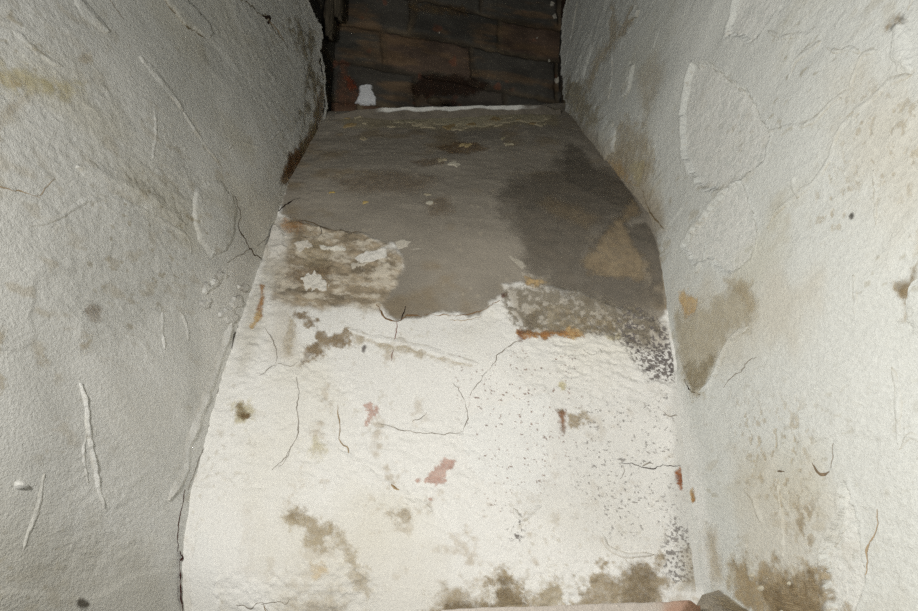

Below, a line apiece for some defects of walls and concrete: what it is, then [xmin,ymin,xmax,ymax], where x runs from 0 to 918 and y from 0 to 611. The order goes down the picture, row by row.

crack [0,180,53,197]
peeling [300,270,329,291]
peeling [293,240,346,253]
peeling [346,246,387,269]
peeling [376,255,659,344]
leakage [503,145,675,381]
crack [382,339,523,435]
crack [621,462,681,478]
leakage [572,518,693,605]
leakage [432,570,562,611]
leakage [721,557,830,611]